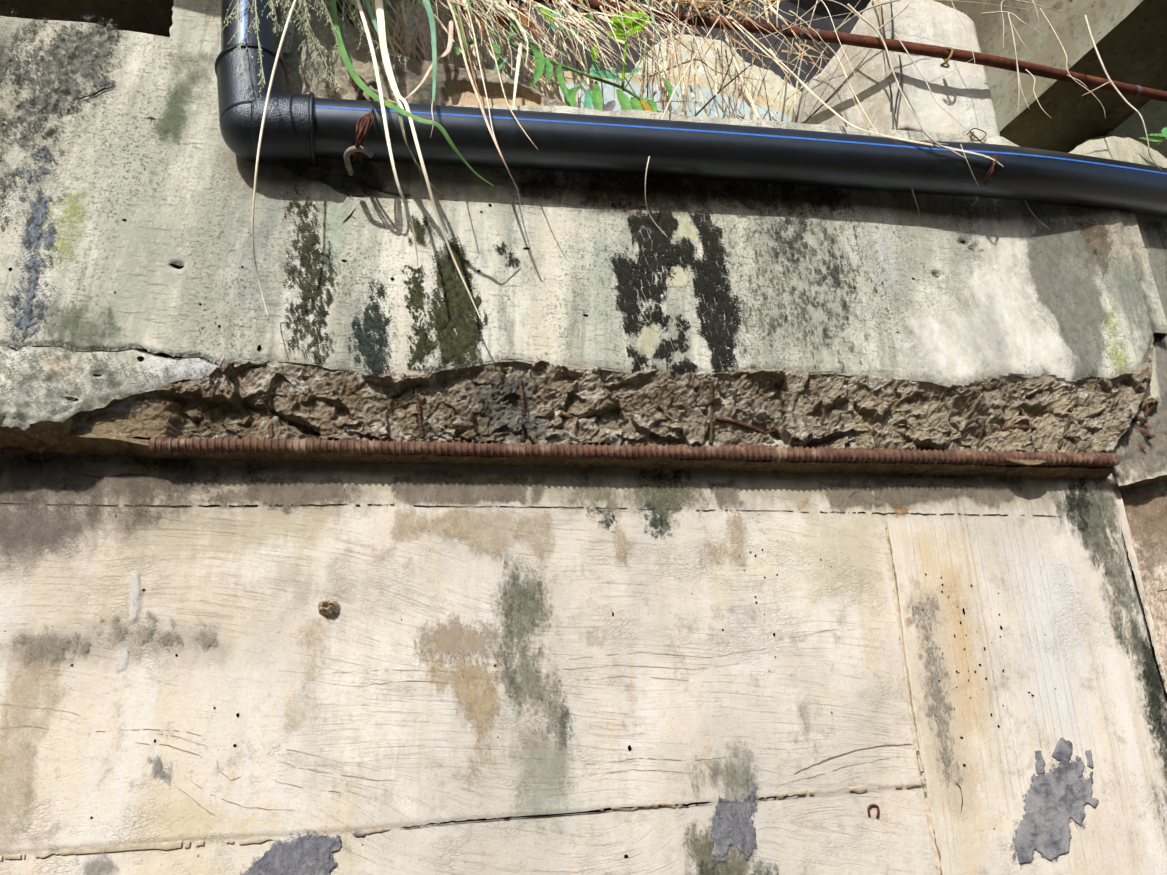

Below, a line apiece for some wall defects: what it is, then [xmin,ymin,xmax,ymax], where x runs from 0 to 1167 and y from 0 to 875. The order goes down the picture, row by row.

mould [0,9,36,90]
mould [0,109,66,359]
peeling [671,211,701,245]
mould [283,184,488,378]
peeling [666,264,690,289]
water stain [606,184,1108,385]
crack [8,345,218,365]
spalling [74,317,1159,466]
water stain [1065,480,1093,531]
water stain [1142,638,1167,779]
peeling [1034,737,1093,783]